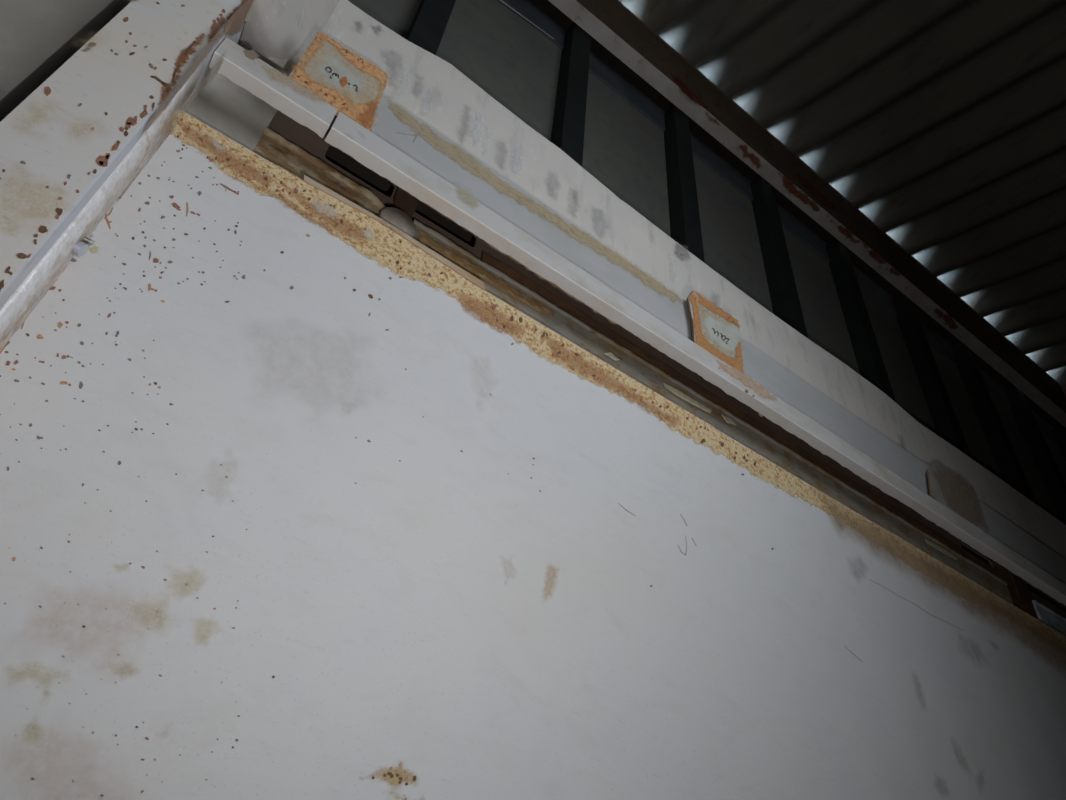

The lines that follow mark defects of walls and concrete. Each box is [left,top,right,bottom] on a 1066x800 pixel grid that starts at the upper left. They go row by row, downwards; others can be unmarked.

rust [151,0,253,104]
rust [0,341,45,385]
rust [105,32,1066,666]
peeling [663,383,736,425]